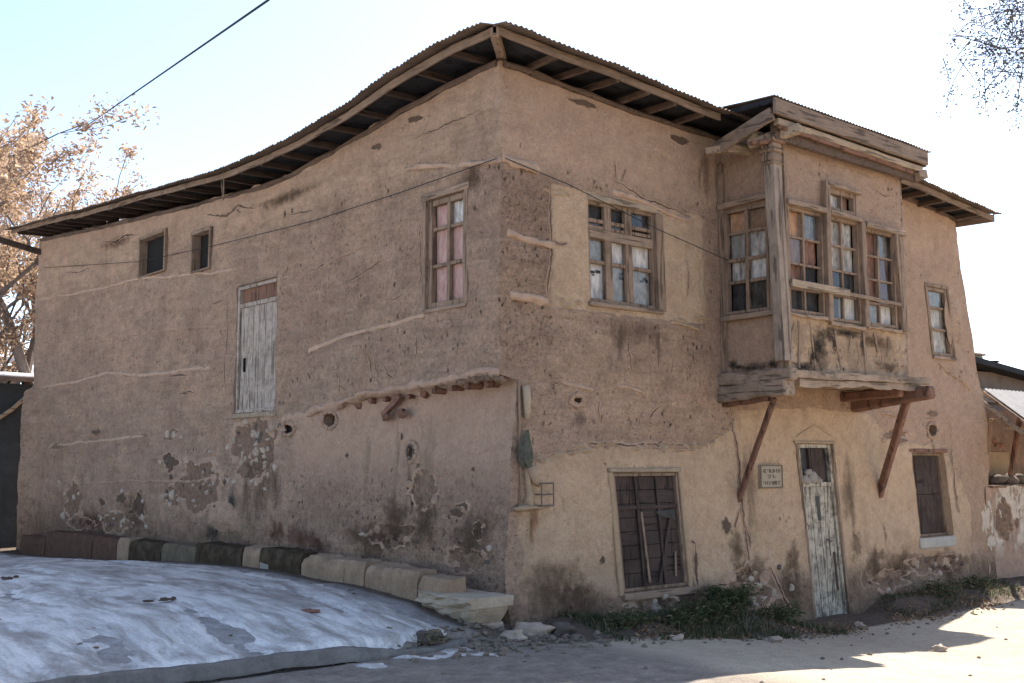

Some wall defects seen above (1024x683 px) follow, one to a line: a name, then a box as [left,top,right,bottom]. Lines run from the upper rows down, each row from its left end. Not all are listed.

crack [408,109,482,142]
crack [203,203,257,219]
leakage [796,328,895,371]
crack [571,398,702,451]
spalling [158,410,296,520]
spalling [58,476,148,536]
spalling [359,432,492,576]
flaking render [980,486,1024,552]
spalling [868,552,964,594]